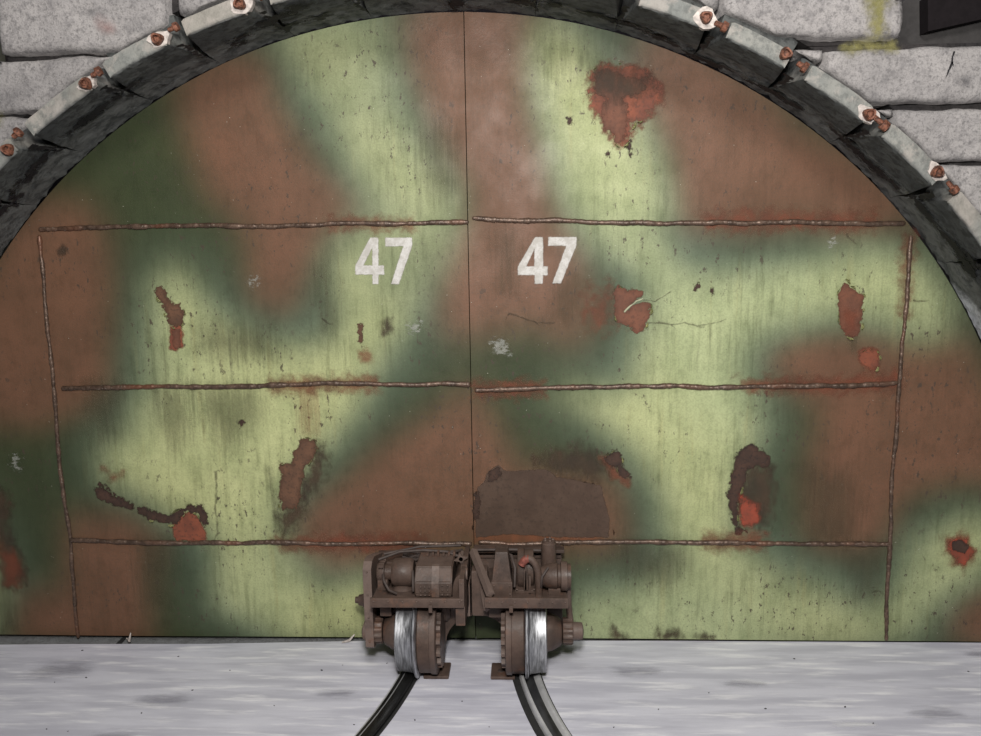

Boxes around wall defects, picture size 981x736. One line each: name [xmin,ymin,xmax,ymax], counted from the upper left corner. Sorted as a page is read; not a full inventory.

rust [586,62,664,158]
rust [947,537,976,566]